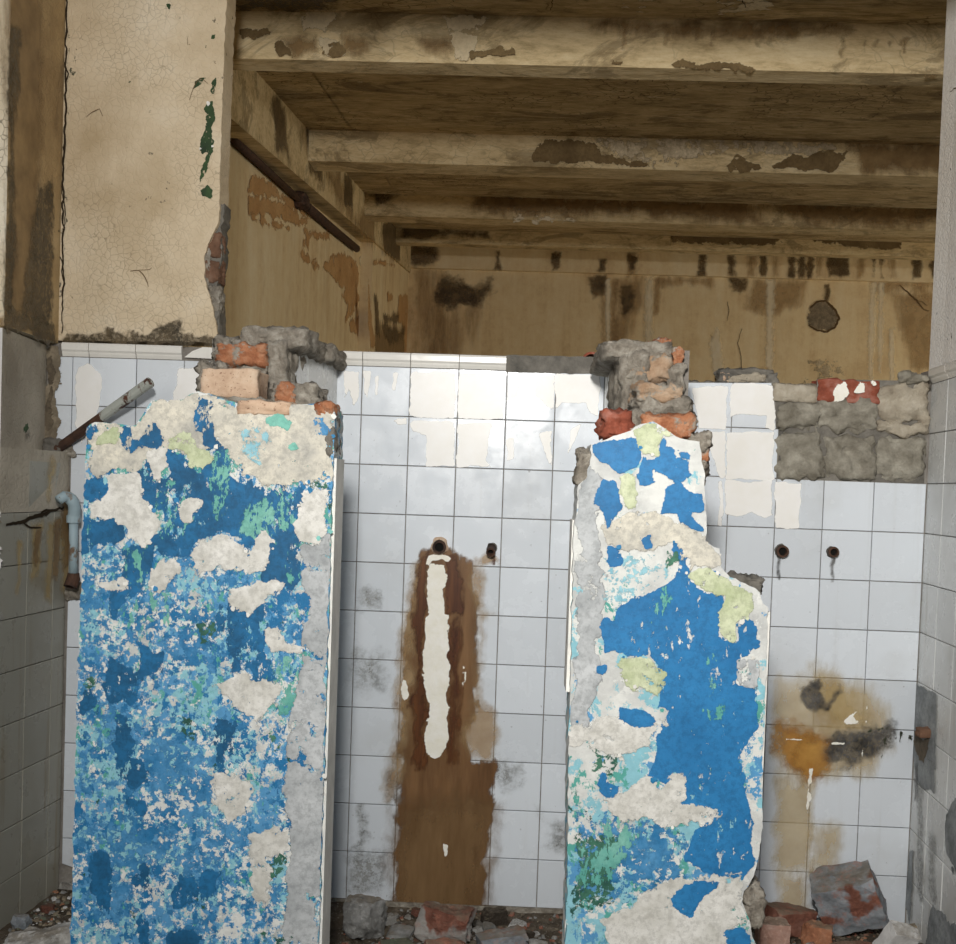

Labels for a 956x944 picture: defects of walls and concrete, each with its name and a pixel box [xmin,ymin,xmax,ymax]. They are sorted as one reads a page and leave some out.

crack [60,0,103,333]
spalling [194,78,231,336]
damp [310,164,490,323]
damp [473,197,769,224]
damp [782,205,937,227]
damp [374,294,405,353]
peeling [772,359,931,484]
crack [0,507,64,529]
peeling [600,473,754,643]
peeling [85,393,337,944]
rust [391,548,498,906]
peeling [599,872,748,944]